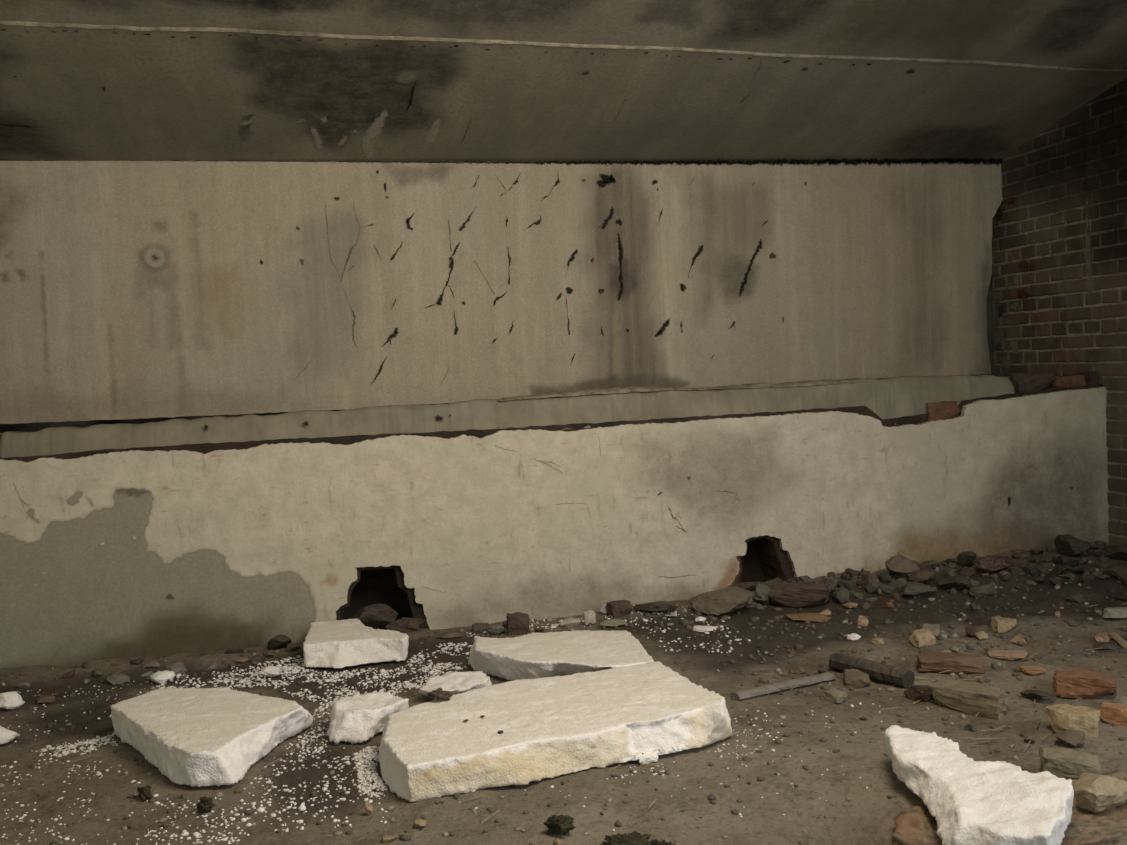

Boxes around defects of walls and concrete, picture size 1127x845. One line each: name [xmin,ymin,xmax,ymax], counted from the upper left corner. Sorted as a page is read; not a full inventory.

leakage [338,111,388,159]
crack [325,199,414,384]
crack [425,174,560,343]
crack [566,249,578,366]
leakage [534,172,687,394]
crack [600,207,624,300]
crack [655,318,683,337]
crack [688,244,703,278]
crack [728,219,769,330]
peeling [0,489,316,668]